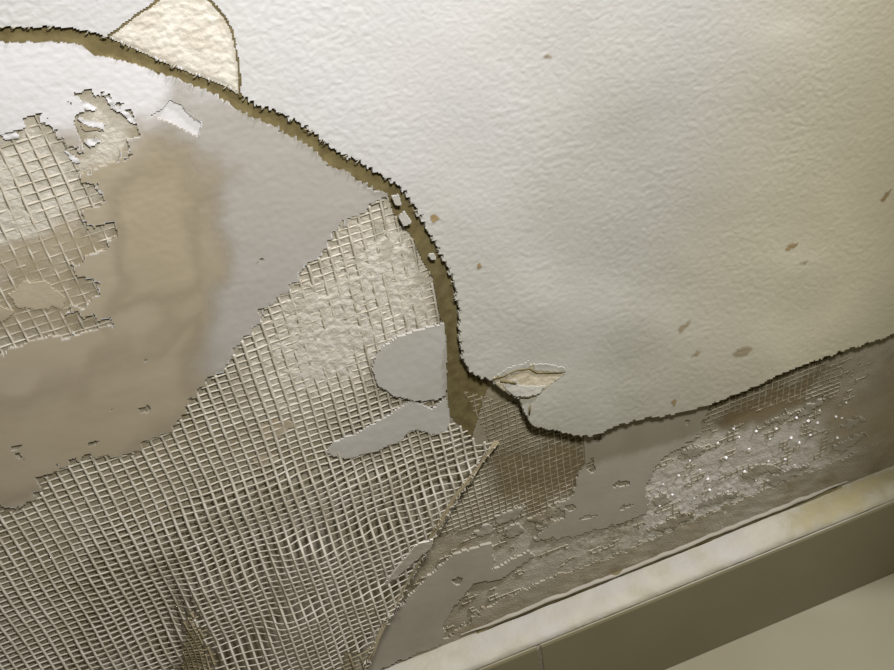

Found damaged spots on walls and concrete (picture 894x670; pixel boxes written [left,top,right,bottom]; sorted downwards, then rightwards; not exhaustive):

flaking render [0,276,114,357]
flaking render [0,0,318,271]
crack [0,0,488,438]
peeling [371,322,448,401]
peeling [492,360,566,415]
flaking render [351,405,894,670]